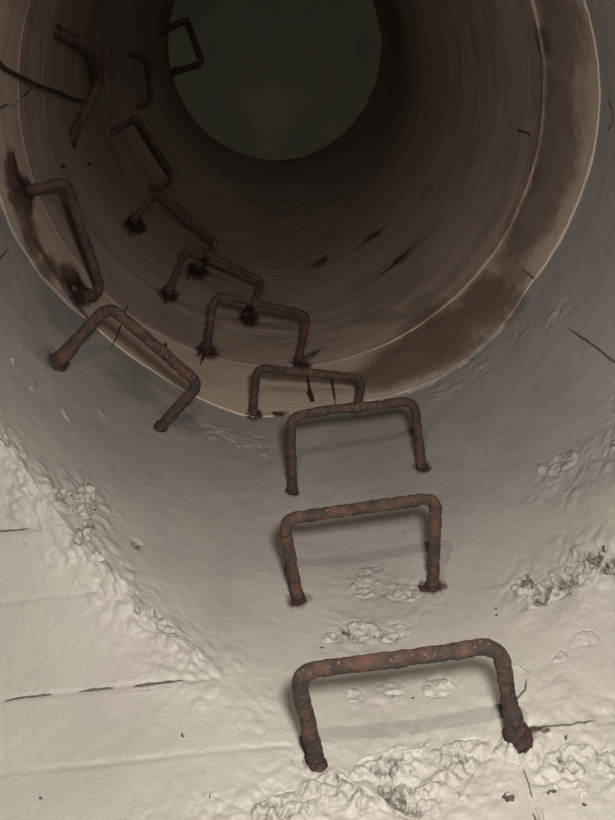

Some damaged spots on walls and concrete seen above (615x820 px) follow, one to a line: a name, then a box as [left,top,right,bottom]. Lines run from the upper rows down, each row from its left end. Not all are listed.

corrosion [4,152,34,212]
leakage [354,0,581,389]
corrosion [61,271,96,308]
corrosion [46,349,69,372]
crack [571,330,615,366]
corrosion [290,356,315,402]
corrosion [288,592,307,607]
corrosion [418,580,446,593]
crack [6,693,51,701]
crack [82,680,183,692]
corrosion [502,722,549,754]
corrosion [305,754,328,771]